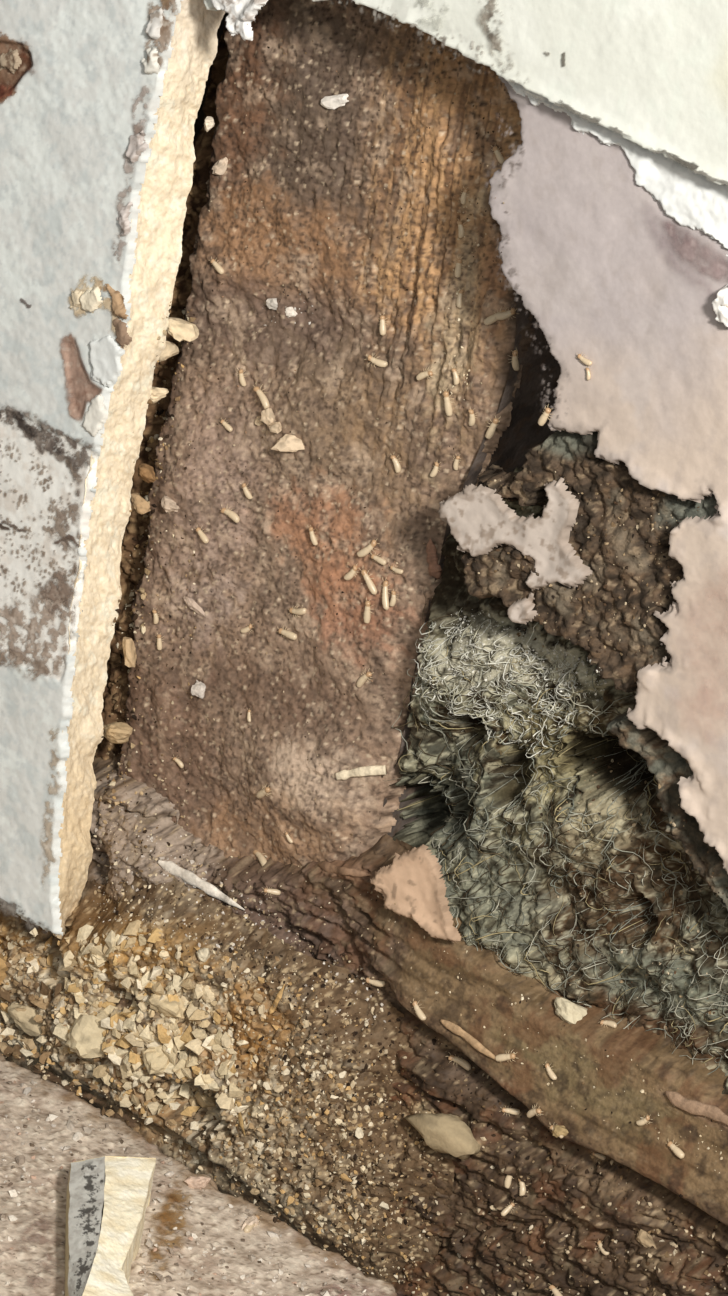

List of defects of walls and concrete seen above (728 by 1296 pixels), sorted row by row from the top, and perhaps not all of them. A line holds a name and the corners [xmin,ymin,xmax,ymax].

spalling [0,32,30,103]
spalling [112,0,177,261]
spalling [321,94,349,109]
peeling [61,277,132,437]
mould [0,406,93,680]